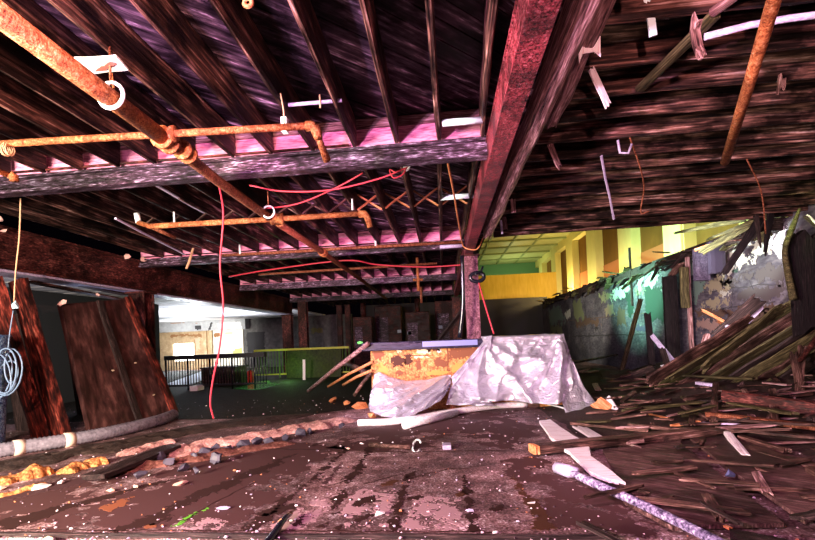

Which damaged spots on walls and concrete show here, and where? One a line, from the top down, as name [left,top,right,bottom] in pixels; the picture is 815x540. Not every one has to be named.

spalling [684,225,788,334]
corrosion [372,347,478,378]